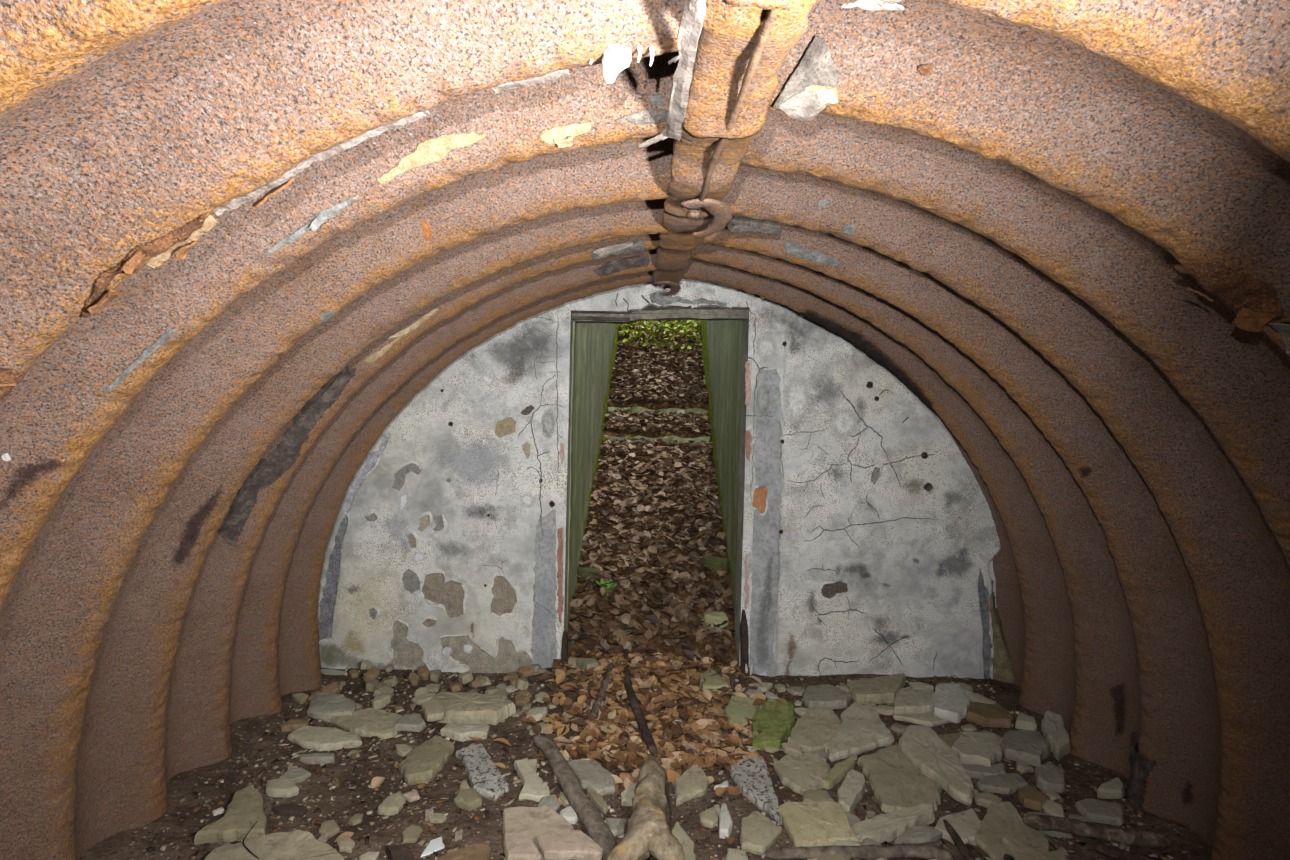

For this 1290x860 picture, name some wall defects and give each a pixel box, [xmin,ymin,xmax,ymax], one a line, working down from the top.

peeling [773,36,840,122]
corrosion [918,64,933,76]
peeling [146,110,431,268]
corrosion [82,214,206,318]
corrosion [1173,262,1285,332]
corrosion [0,368,26,399]
flaking render [492,402,535,459]
crack [615,293,937,676]
flaking render [388,500,564,673]